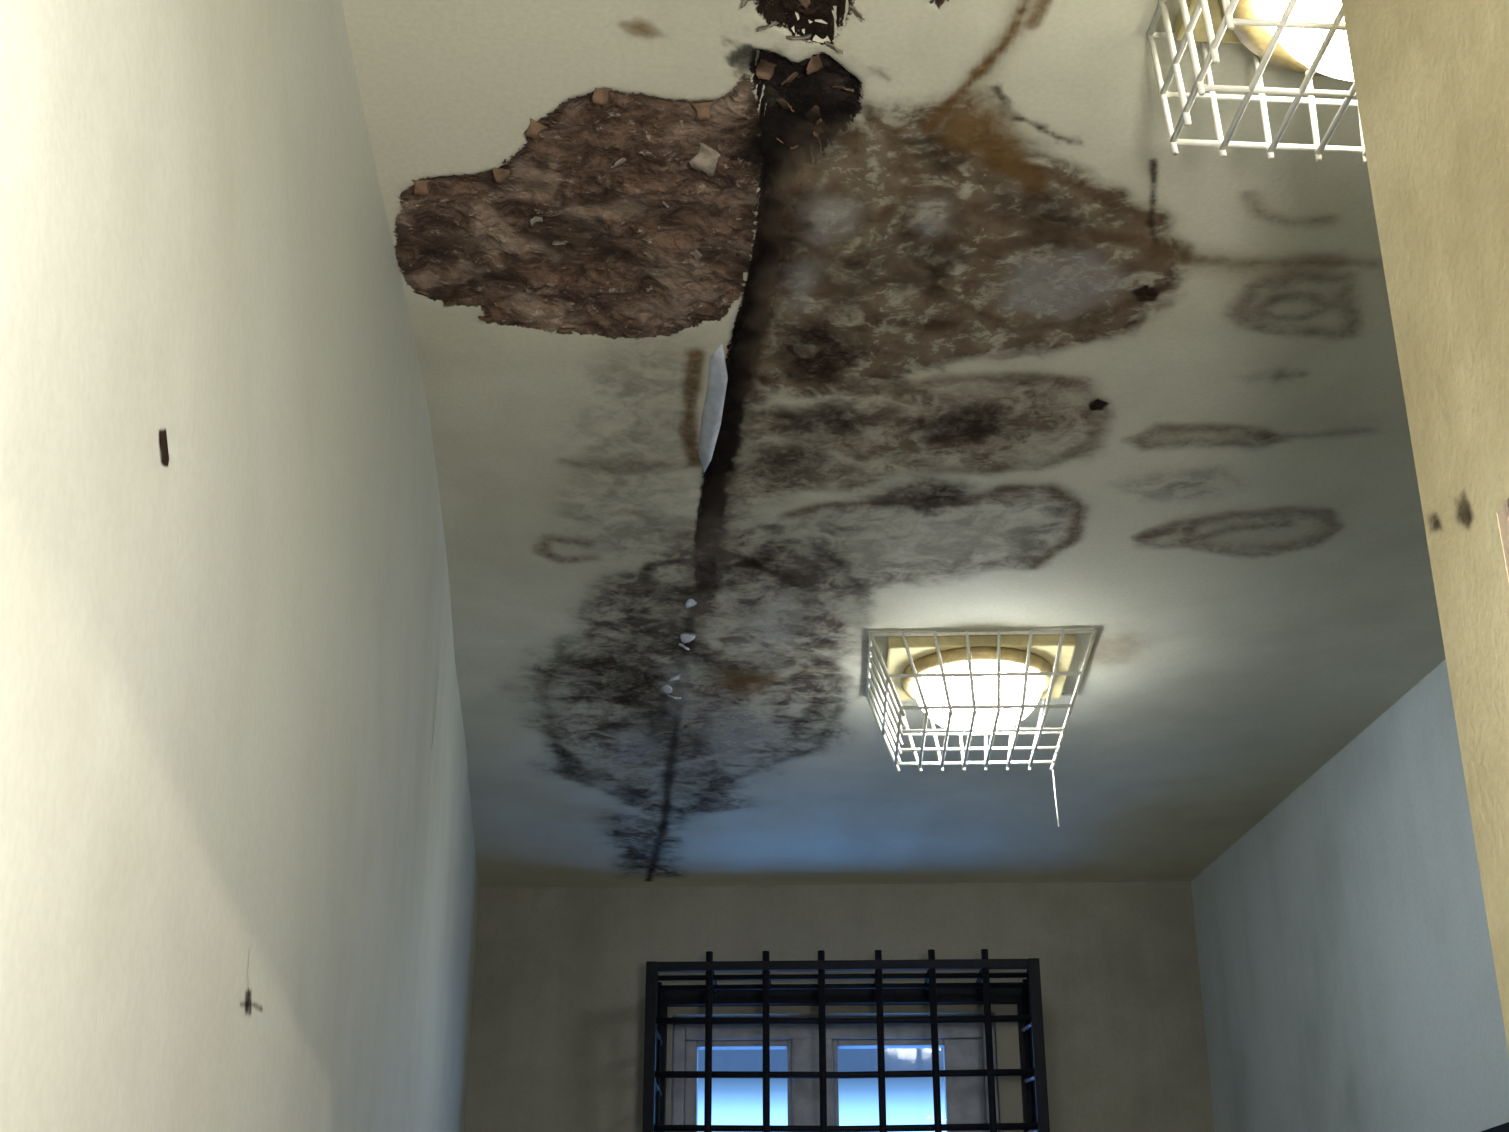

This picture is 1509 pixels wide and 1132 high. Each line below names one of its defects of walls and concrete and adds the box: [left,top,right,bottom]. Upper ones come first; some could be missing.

flaking render [741,0,865,54]
flaking render [393,73,763,340]
peeling [681,344,728,473]
crack [639,45,863,881]
damp [533,98,1186,876]